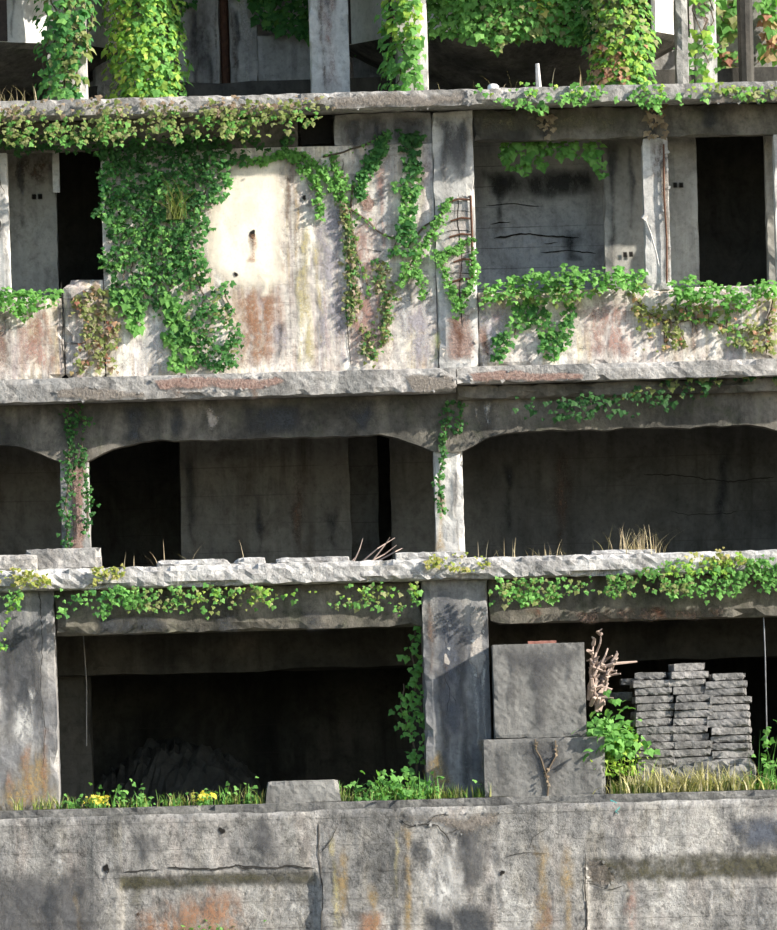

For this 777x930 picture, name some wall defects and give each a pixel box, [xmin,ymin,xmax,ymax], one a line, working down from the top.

water stain [487,172,591,219]
rust [241,296,274,358]
crack [126,825,337,930]